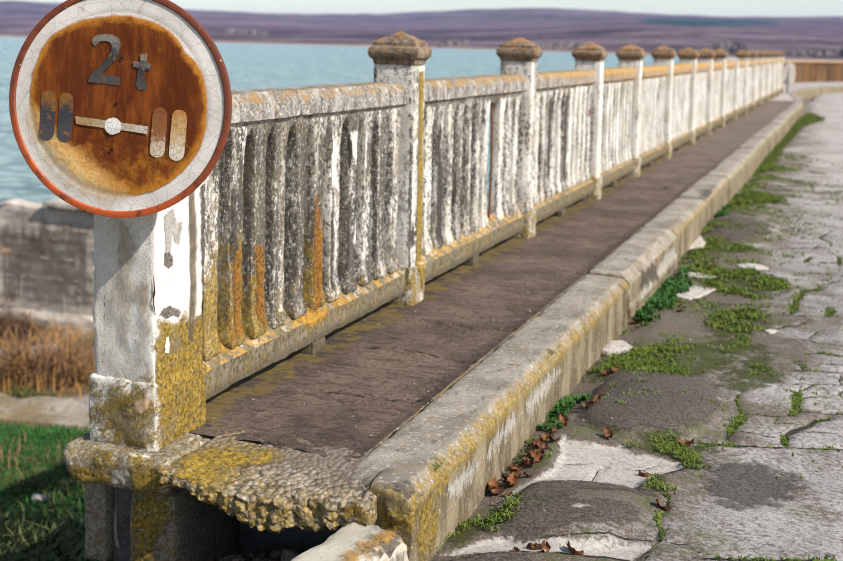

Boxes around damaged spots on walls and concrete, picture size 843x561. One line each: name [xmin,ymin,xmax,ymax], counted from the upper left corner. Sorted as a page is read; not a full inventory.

rust [30,15,207,196]
damp [435,127,444,244]
damp [546,95,568,184]
rust [229,246,243,341]
rust [254,244,268,331]
rust [303,195,324,316]
mould [323,190,351,302]
crack [697,229,843,450]
spalling [441,536,652,561]
spalling [498,436,684,507]
crack [501,466,837,561]
damp [699,460,807,510]